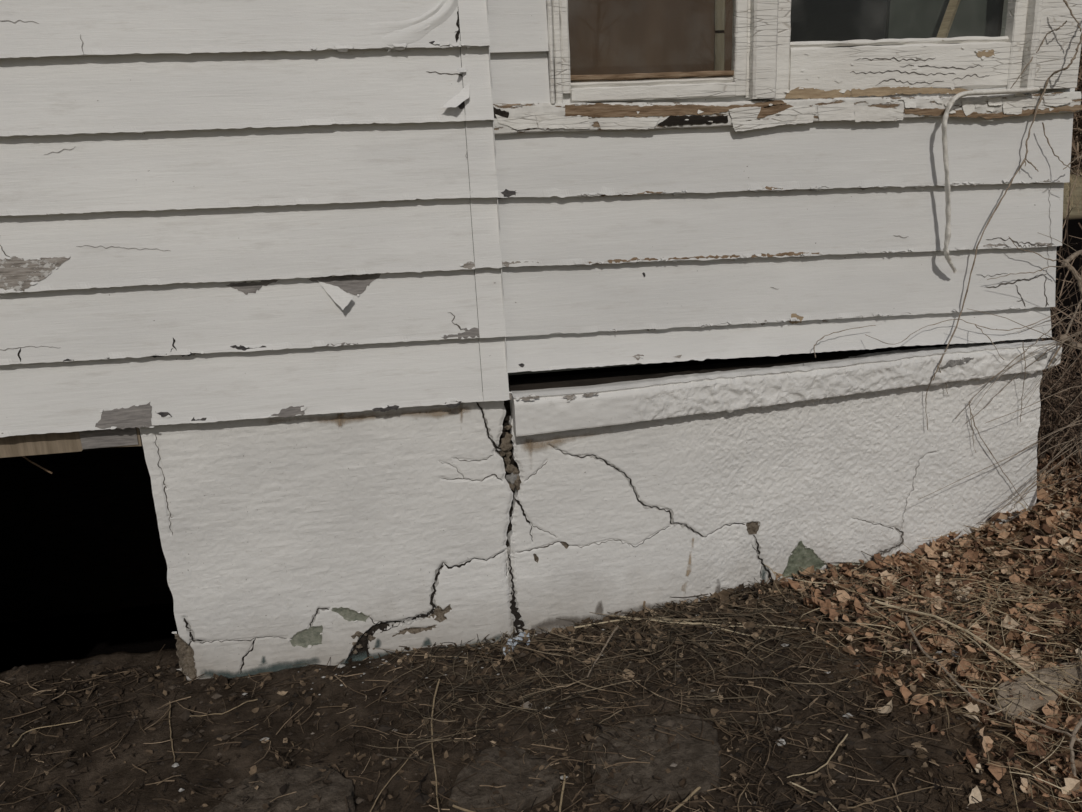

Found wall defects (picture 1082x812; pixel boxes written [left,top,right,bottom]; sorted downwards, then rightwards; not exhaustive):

crack [799,45,985,89]
peeling [975,49,995,60]
peeling [493,86,1072,273]
peeling [0,245,70,292]
peeling [220,279,282,295]
peeling [301,273,380,310]
peeling [573,252,823,277]
peeling [442,312,480,339]
peeling [95,402,172,429]
crack [369,389,774,635]
crack [310,607,329,627]
crack [183,618,283,673]